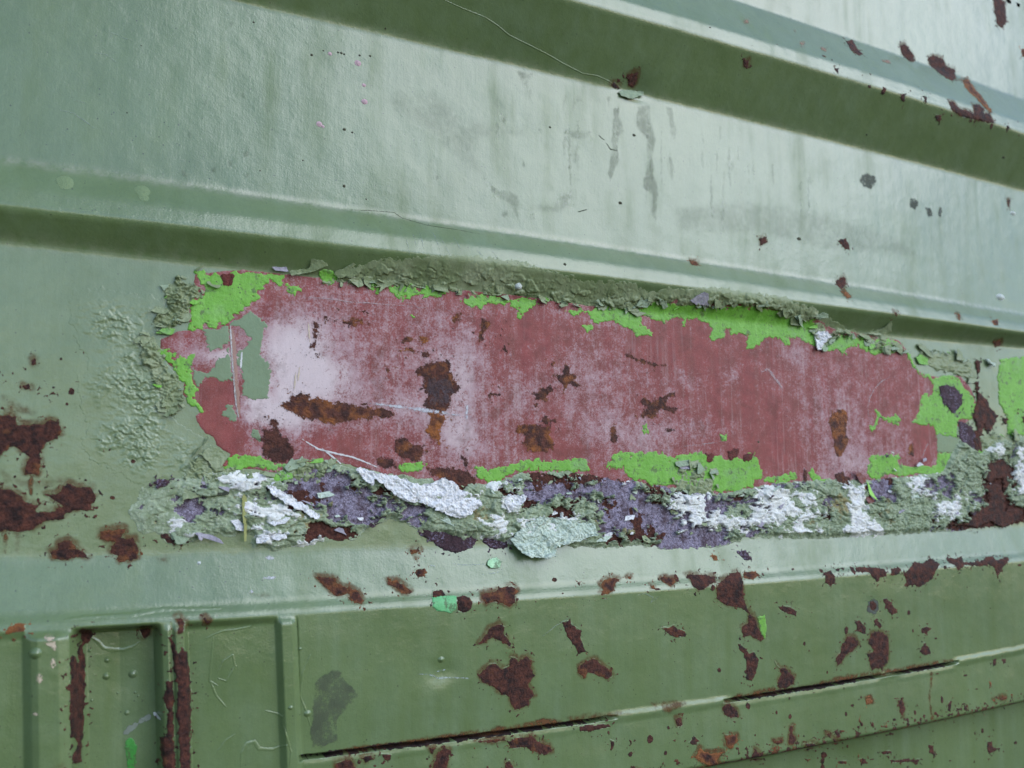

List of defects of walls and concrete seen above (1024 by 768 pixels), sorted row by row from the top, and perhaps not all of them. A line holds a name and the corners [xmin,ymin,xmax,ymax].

rust [898,40,1018,132]
rust [0,358,199,568]
peeling [171,532,190,545]
rust [253,327,478,490]
peeling [134,254,977,519]
rust [826,406,853,484]
peeling [978,356,1024,484]
rust [59,622,99,768]
rust [128,614,212,768]
rust [301,529,653,768]
rust [598,545,1024,768]